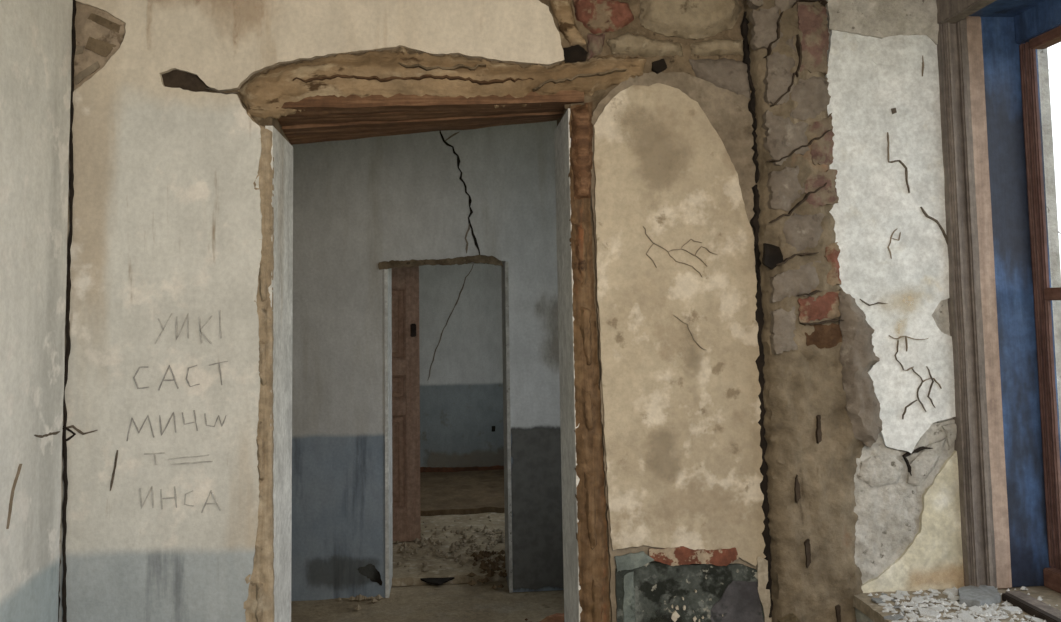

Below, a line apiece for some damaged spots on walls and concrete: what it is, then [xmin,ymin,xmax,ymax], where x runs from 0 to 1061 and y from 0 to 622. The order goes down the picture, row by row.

crack [34,0,97,622]
crack [428,131,480,379]
crack [643,226,717,277]
flaking render [541,0,939,360]
crack [887,229,901,259]
crack [887,132,948,245]
spalling [932,299,950,336]
crack [889,335,942,420]
spalling [854,419,957,584]
peeling [614,546,772,622]